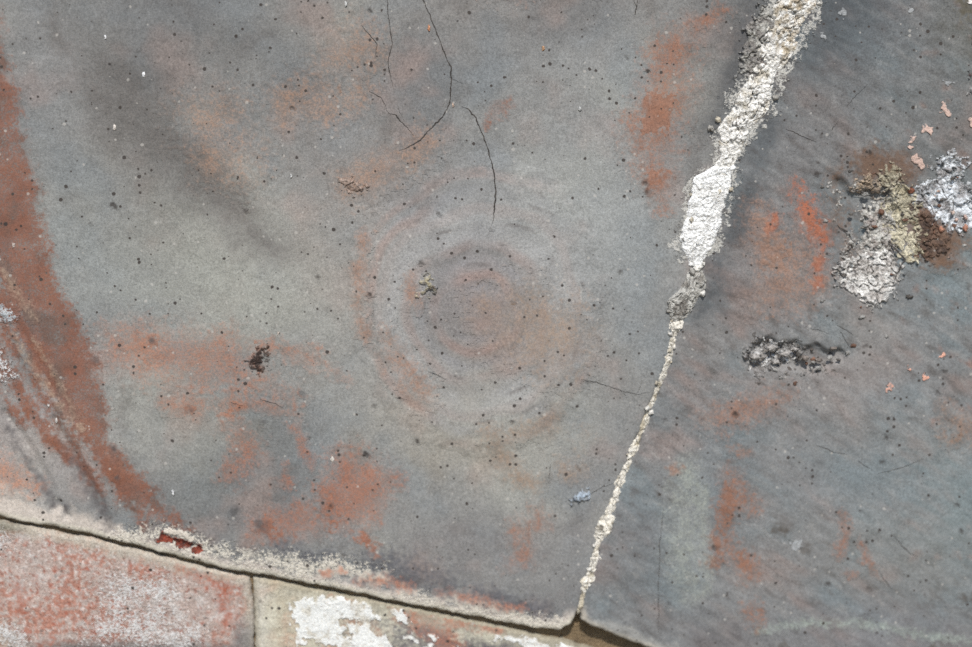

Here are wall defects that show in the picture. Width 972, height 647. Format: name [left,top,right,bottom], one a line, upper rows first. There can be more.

water stain [0,250,87,433]
water stain [24,0,317,289]
corrosion [0,0,464,553]
crack [363,0,497,223]
corrosion [603,0,741,222]
spalling [736,331,856,386]
spalling [813,124,972,319]
crack [889,239,906,284]
spalling [154,527,203,554]
corrosion [168,562,244,641]
water stain [0,418,568,647]
peeling [288,594,439,647]